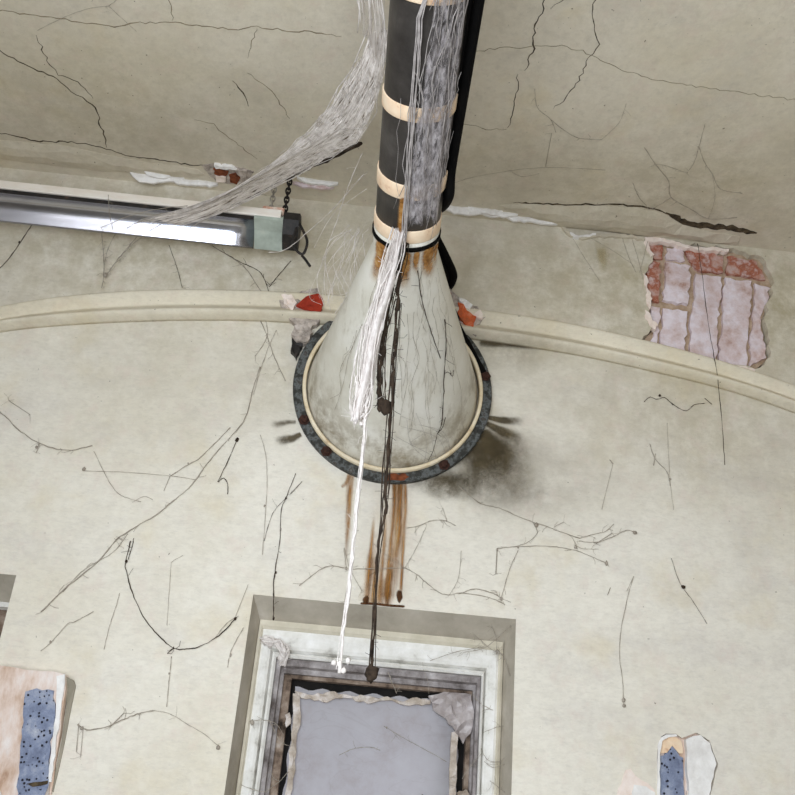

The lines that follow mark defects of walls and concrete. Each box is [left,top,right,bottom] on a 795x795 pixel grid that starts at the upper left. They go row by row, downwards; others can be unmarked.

crack [515,202,757,234]
spalling [446,205,771,371]
spalling [279,288,323,360]
damp [465,422,515,476]
corrosion [342,482,352,537]
corrosion [360,473,409,608]
damp [430,475,469,493]
spalling [0,666,76,795]
spalling [617,733,716,795]